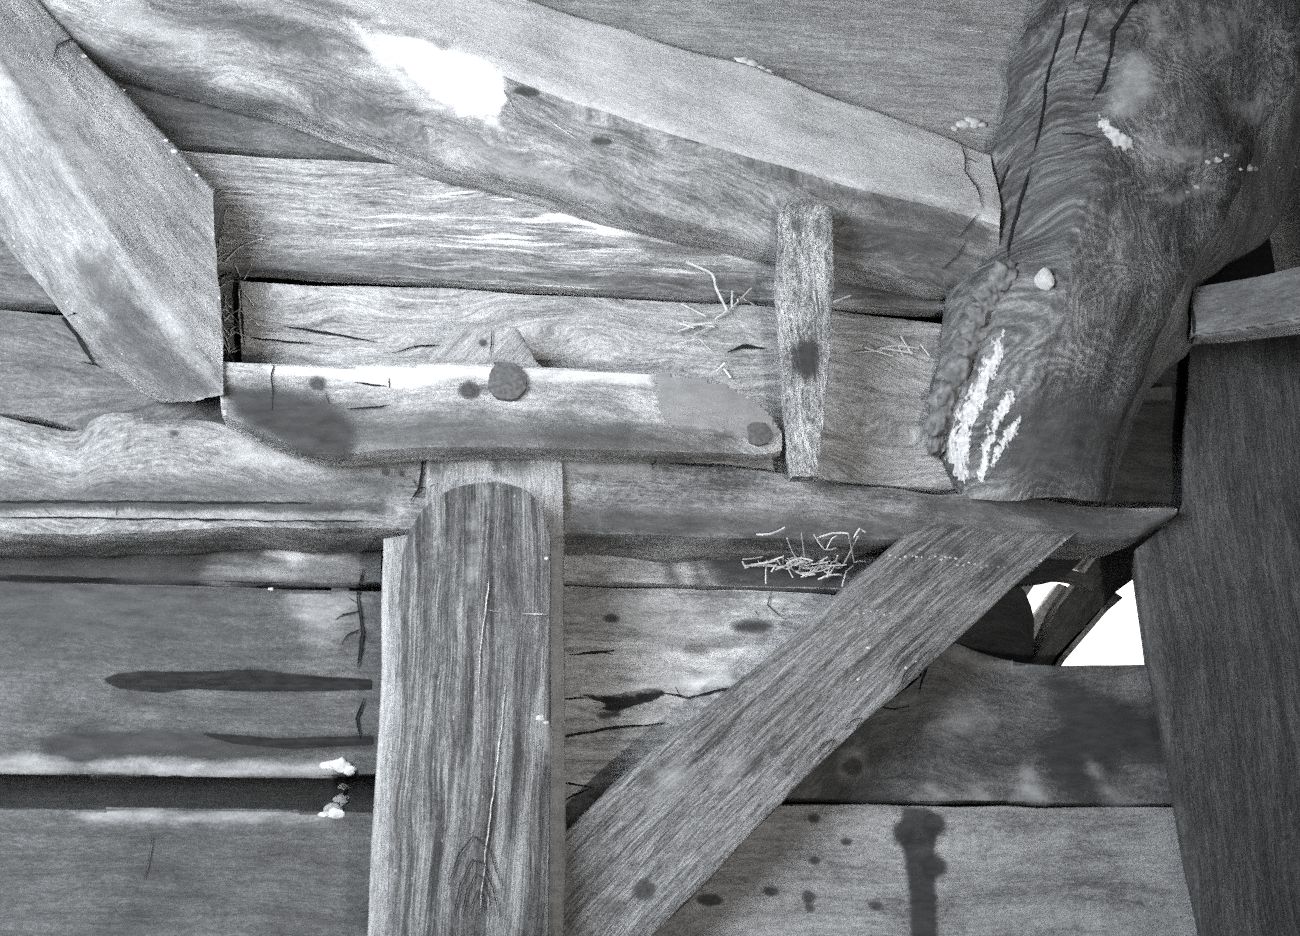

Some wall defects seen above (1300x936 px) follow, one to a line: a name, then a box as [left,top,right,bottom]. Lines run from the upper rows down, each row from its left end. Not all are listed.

crack [946,0,1137,266]
leakage [226,389,690,469]
leakage [0,730,372,774]
leakage [893,808,946,936]